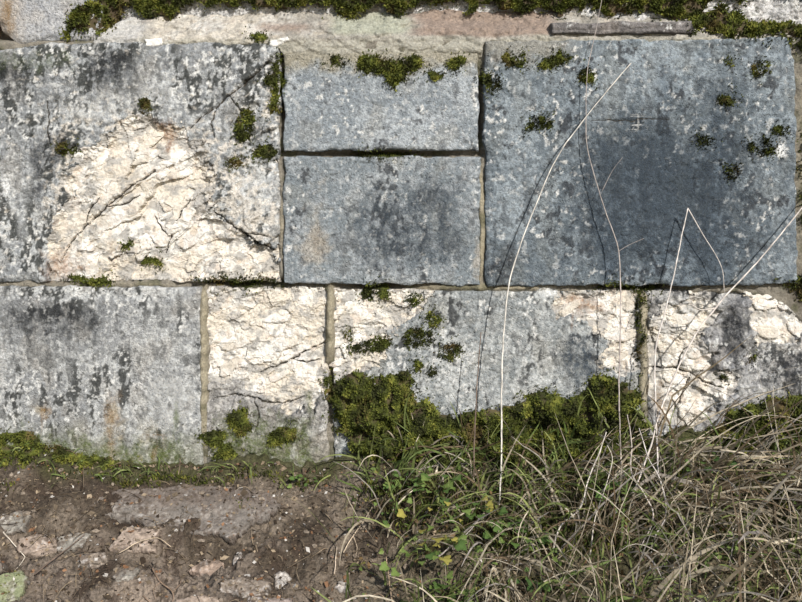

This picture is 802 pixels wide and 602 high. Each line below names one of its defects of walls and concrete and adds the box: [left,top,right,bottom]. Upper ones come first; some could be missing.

crack [62,170,156,260]
crack [155,201,190,252]
crack [261,342,327,372]
crack [645,347,722,411]
crack [217,393,305,428]